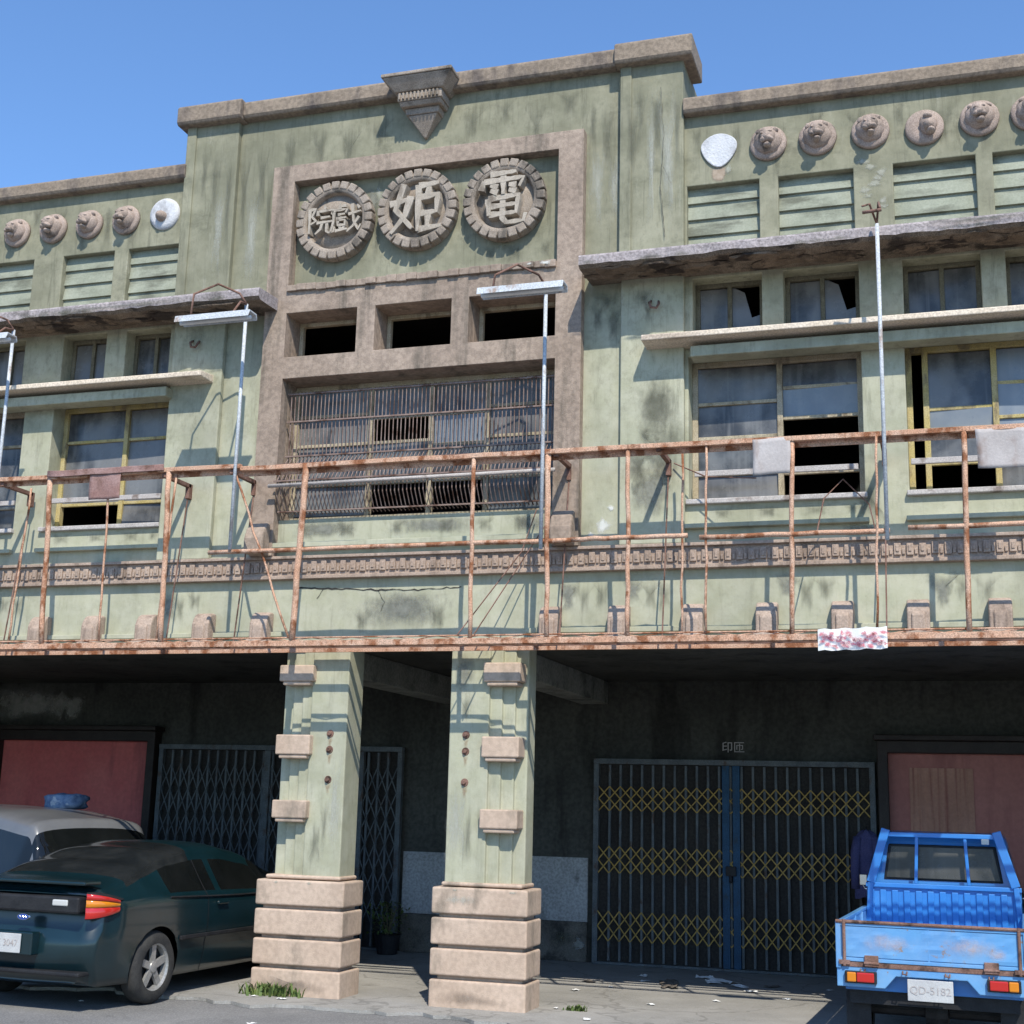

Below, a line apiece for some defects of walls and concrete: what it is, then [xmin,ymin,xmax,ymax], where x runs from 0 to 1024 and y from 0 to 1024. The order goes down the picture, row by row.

spalling [892,224,1024,255]
spalling [583,236,864,281]
spalling [0,297,245,334]
water stain [647,391,666,420]
water stain [634,456,666,506]
crack [299,586,461,607]
water stain [380,597,431,620]